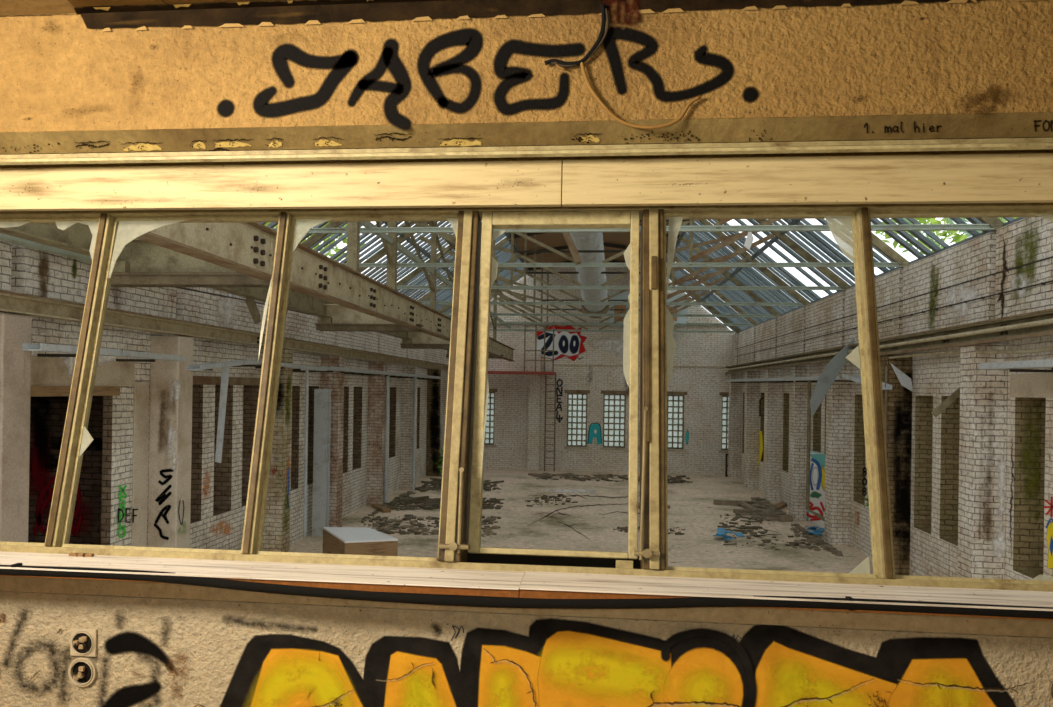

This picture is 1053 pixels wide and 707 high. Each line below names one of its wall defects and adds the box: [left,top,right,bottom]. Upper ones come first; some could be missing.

peeling [75,141,161,151]
peeling [190,139,252,151]
peeling [314,137,342,147]
peeling [374,133,411,141]
damp [895,373,913,550]
crack [375,662,434,680]
crack [483,648,536,707]
crack [648,690,740,707]
crack [782,678,874,707]
crack [899,678,1032,693]